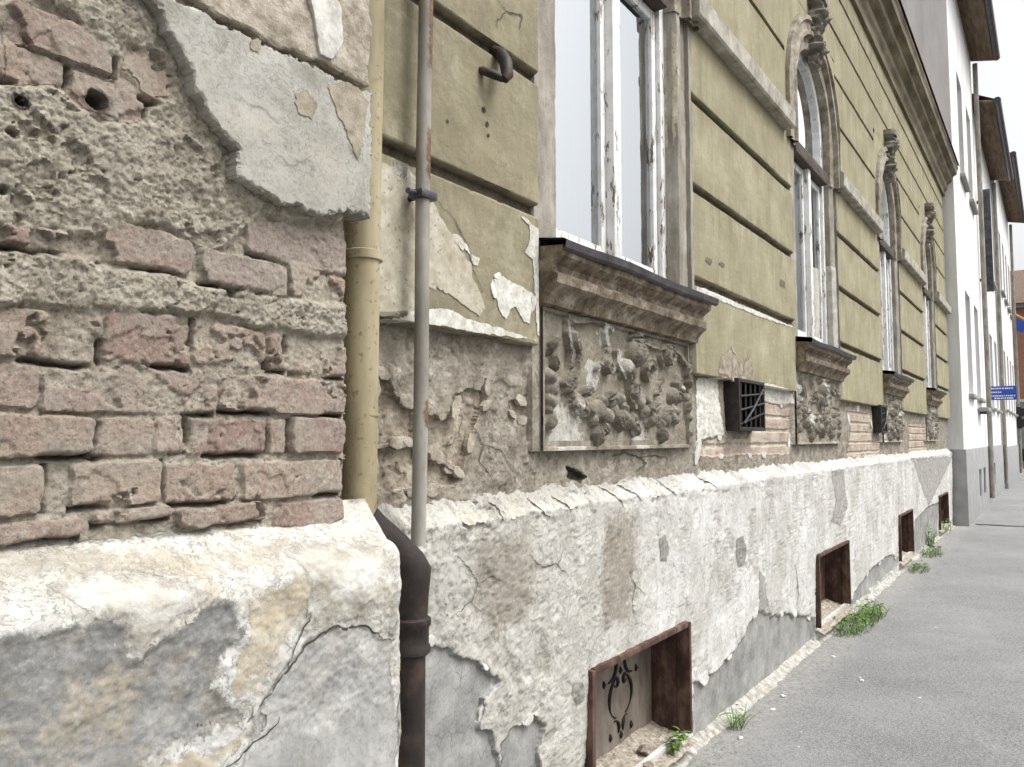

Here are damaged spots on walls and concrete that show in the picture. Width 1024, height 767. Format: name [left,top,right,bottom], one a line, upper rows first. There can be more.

crack [497,1,523,29]
peeling [663,27,679,158]
peeling [0,0,416,324]
peeling [429,202,539,341]
spalling [377,366,413,498]
spalling [427,378,492,497]
spalling [508,394,527,425]
crack [457,556,507,614]
crack [227,617,395,767]
peeling [425,635,546,767]
peeling [689,606,815,739]